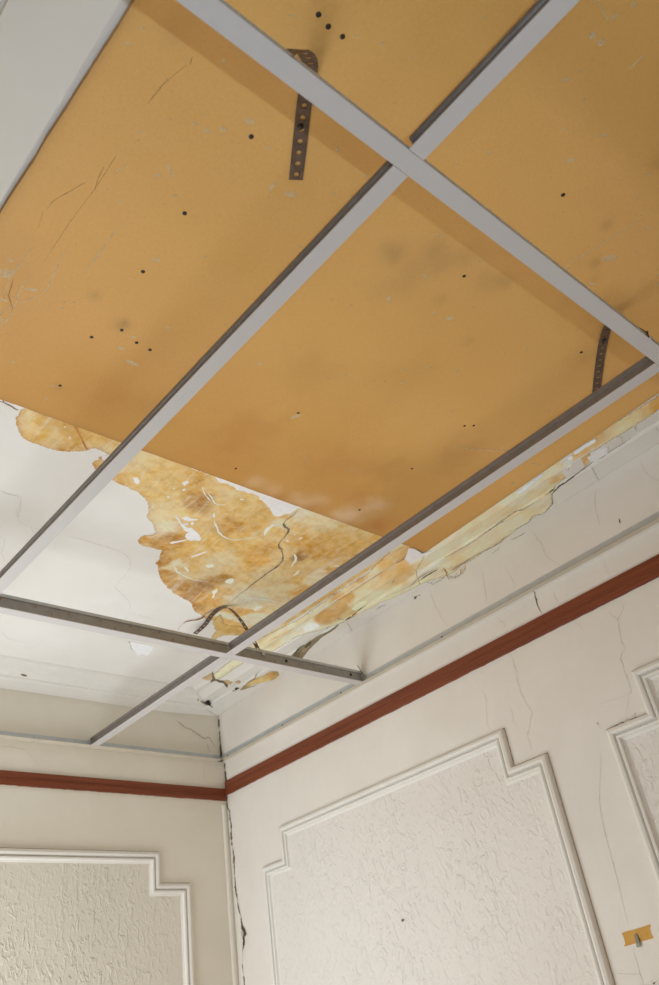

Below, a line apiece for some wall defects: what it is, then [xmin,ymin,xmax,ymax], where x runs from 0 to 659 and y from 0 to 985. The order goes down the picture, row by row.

peeling [5,401,121,469]
peeling [112,450,388,637]
spalling [292,626,336,658]
peeling [405,548,431,565]
leakage [249,396,659,651]
crack [175,718,246,985]